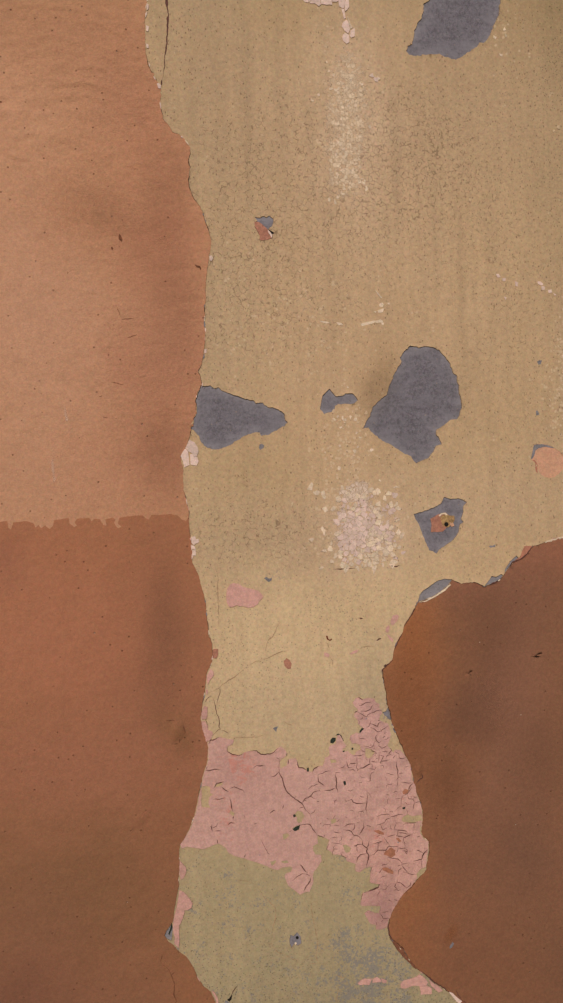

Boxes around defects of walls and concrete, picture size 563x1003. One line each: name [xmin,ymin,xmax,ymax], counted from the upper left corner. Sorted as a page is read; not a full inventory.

peeling [303,0,355,44]
spalling [406,0,507,60]
spalling [254,216,274,241]
spalling [181,385,288,467]
spalling [307,346,467,574]
spalling [531,444,563,478]
spalling [418,579,452,602]
crack [166,627,427,939]
peeling [180,698,462,1003]
peeling [165,861,193,948]